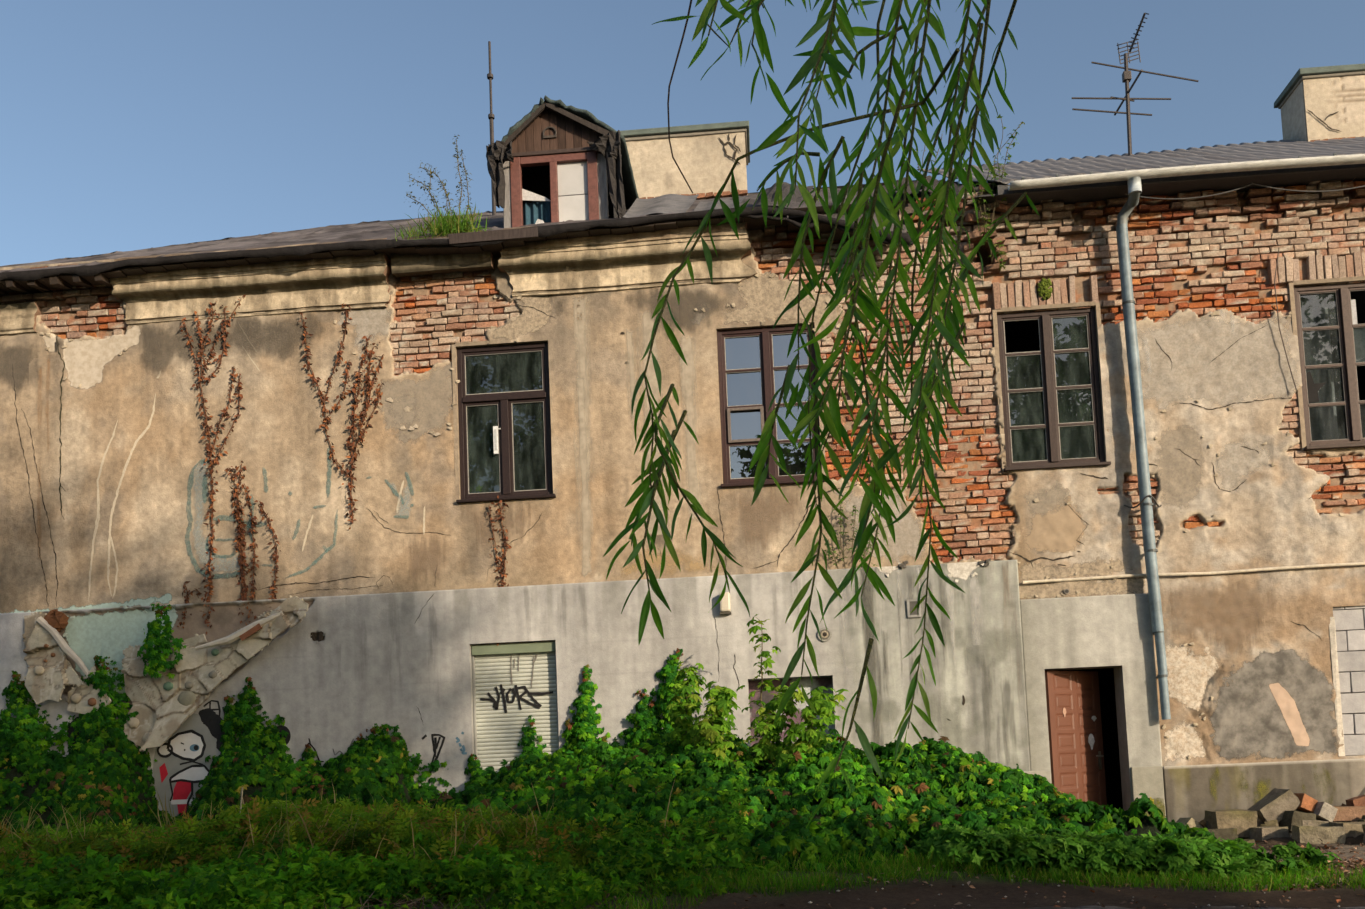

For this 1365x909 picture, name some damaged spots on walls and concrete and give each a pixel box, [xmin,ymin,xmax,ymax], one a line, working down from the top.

flaking render [0,285,141,389]
flaking render [334,270,552,443]
flaking render [724,177,1365,599]
crack [14,344,65,607]
crack [717,484,860,569]
peeling [0,593,178,694]
leakage [863,570,886,745]